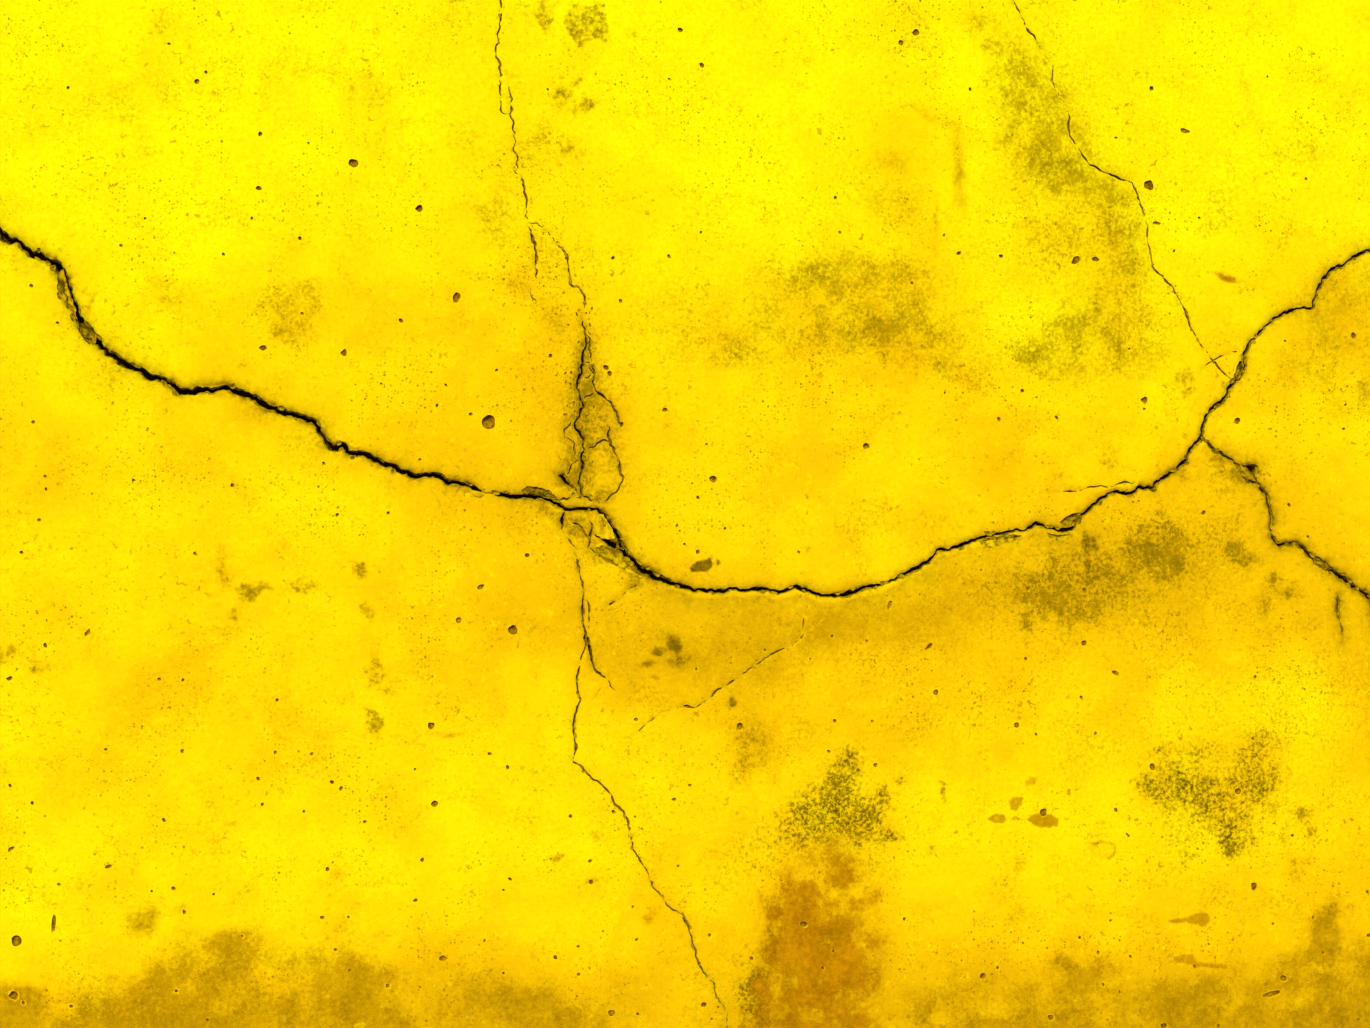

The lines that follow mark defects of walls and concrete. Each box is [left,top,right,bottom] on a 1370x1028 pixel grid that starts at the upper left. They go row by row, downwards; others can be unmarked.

crack [0,0,1370,600]
crack [683,618,822,708]
crack [1335,596,1343,632]
crack [572,558,728,1028]
water stain [780,746,902,847]
water stain [1137,731,1280,856]
water stain [0,932,417,1028]
water stain [439,987,587,1028]
water stain [738,971,769,1027]
water stain [913,903,1370,1028]